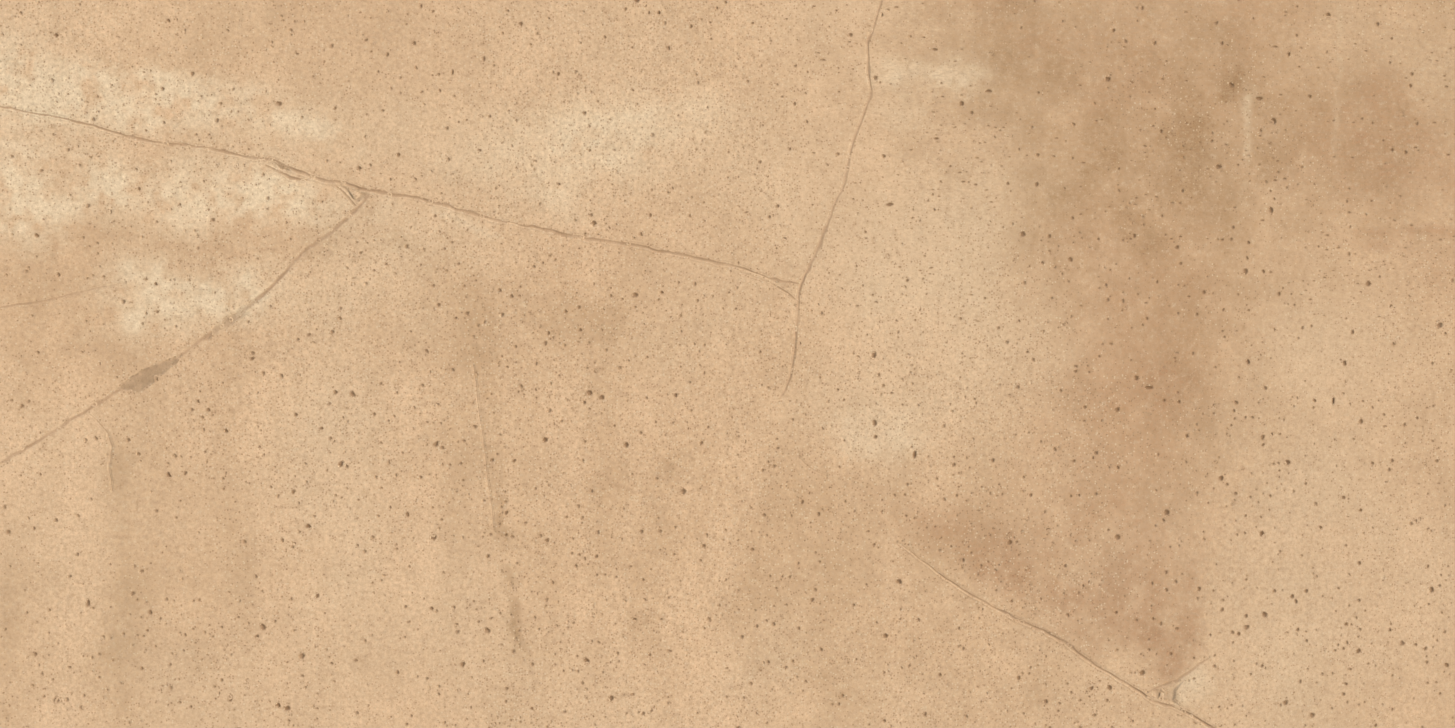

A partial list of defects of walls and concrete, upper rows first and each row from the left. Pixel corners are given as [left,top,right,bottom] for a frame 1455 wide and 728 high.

leakage [0,0,427,357]
crack [0,0,884,466]
leakage [423,73,753,243]
leakage [847,22,1031,141]
leakage [1084,59,1312,228]
crack [897,541,1217,728]
leakage [1167,662,1218,709]